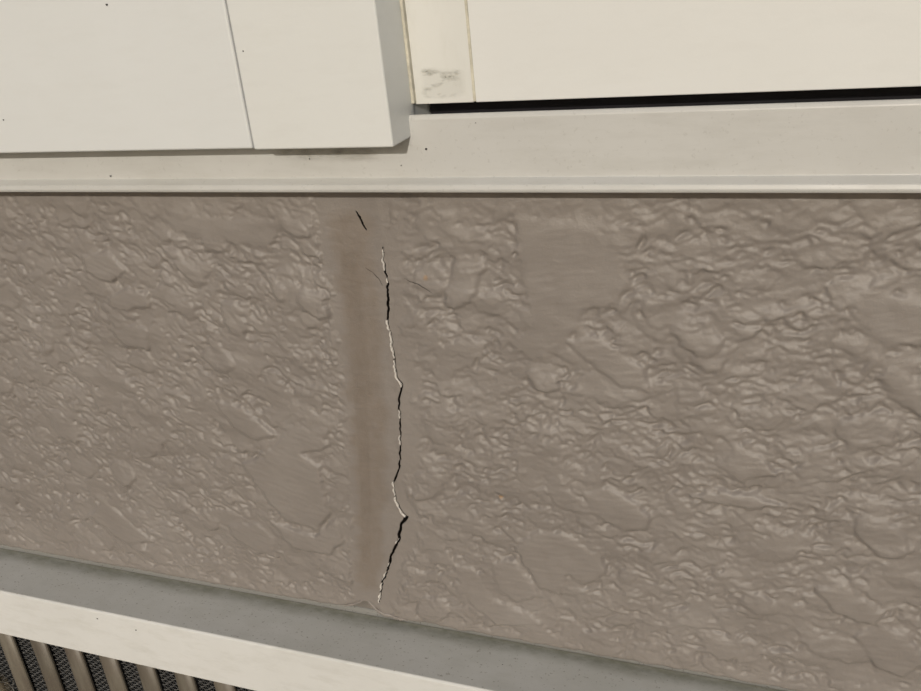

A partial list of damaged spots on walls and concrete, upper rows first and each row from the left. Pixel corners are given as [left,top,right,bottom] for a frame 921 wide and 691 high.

crack [365,247,430,603]